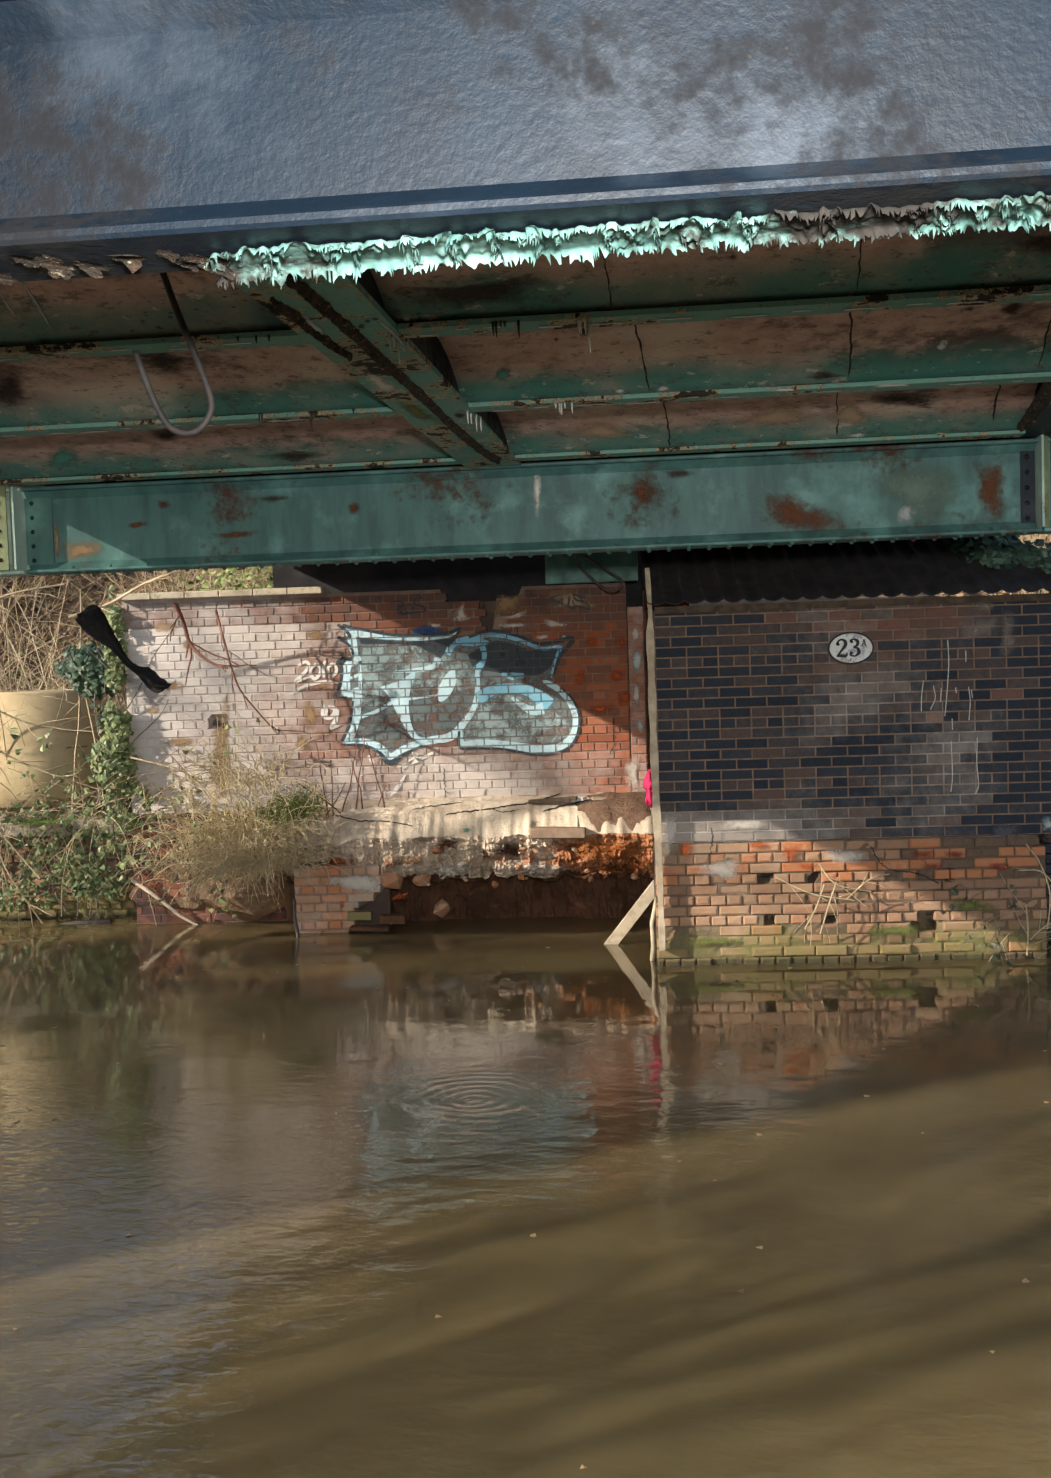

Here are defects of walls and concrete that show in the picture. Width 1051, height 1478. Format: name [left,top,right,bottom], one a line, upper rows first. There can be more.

corrosion [0,249,235,286]
corrosion [269,273,501,464]
corrosion [979,466,1003,518]
corrosion [769,497,843,530]
spalling [483,843,527,859]